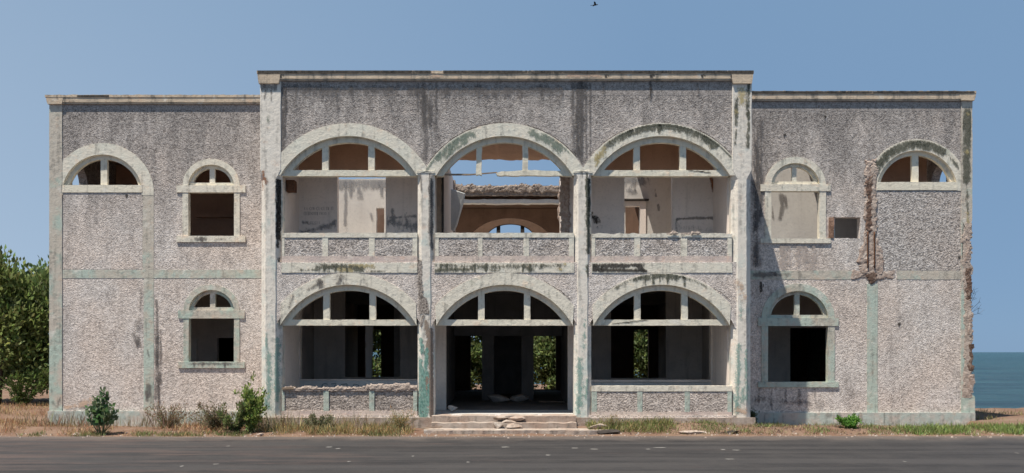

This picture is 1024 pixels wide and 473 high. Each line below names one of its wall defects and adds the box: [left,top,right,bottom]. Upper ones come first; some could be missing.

leakage [62,70,754,233]
leakage [145,300,162,410]
leakage [592,263,707,289]
spalling [851,158,895,284]
spalling [958,222,975,398]